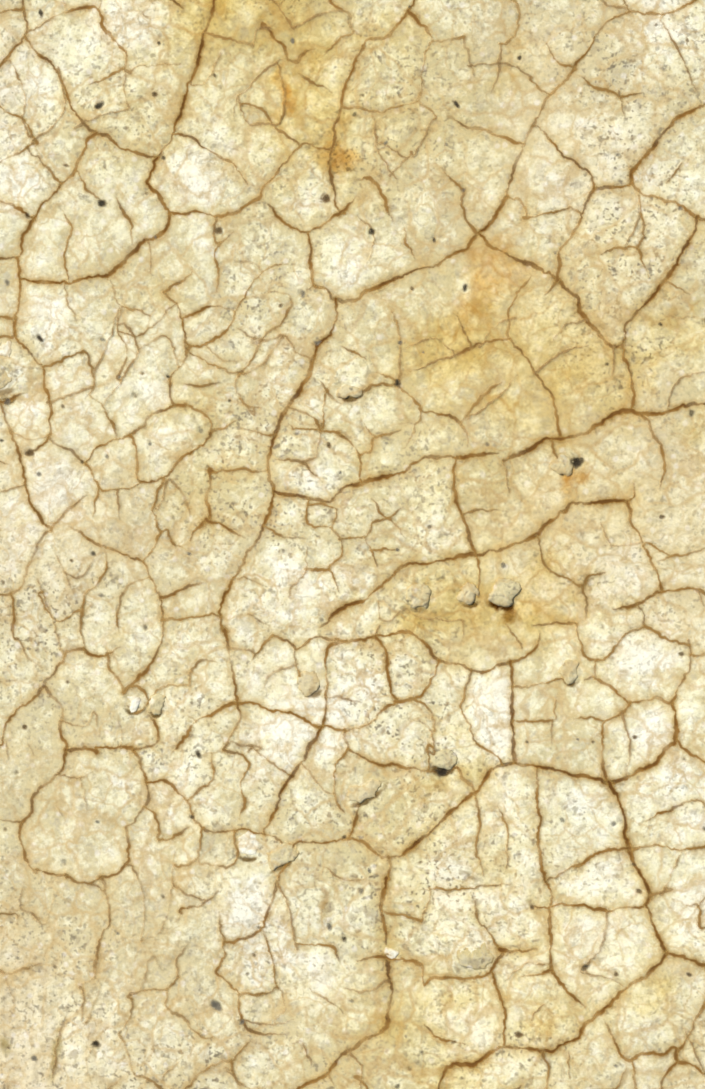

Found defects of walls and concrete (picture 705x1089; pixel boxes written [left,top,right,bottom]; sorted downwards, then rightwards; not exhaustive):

crack [633,105,705,218]
crack [573,780,635,868]
crack [610,701,705,963]
crack [379,876,389,941]
crack [376,959,393,996]
crack [361,955,424,975]
crack [384,911,423,923]
crack [422,947,529,986]
crack [438,972,513,1089]
crack [531,896,614,1004]
crack [517,951,668,1083]
crack [612,1037,705,1089]